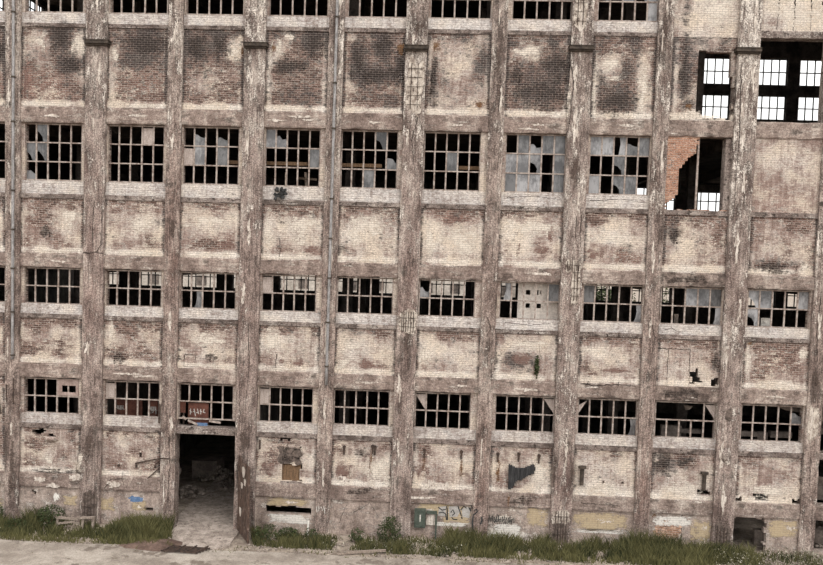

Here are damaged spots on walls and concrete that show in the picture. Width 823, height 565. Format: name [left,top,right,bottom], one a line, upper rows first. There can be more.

leakage [32,20,86,70]
leakage [493,45,572,117]
leakage [591,55,649,119]
peeling [277,446,303,465]